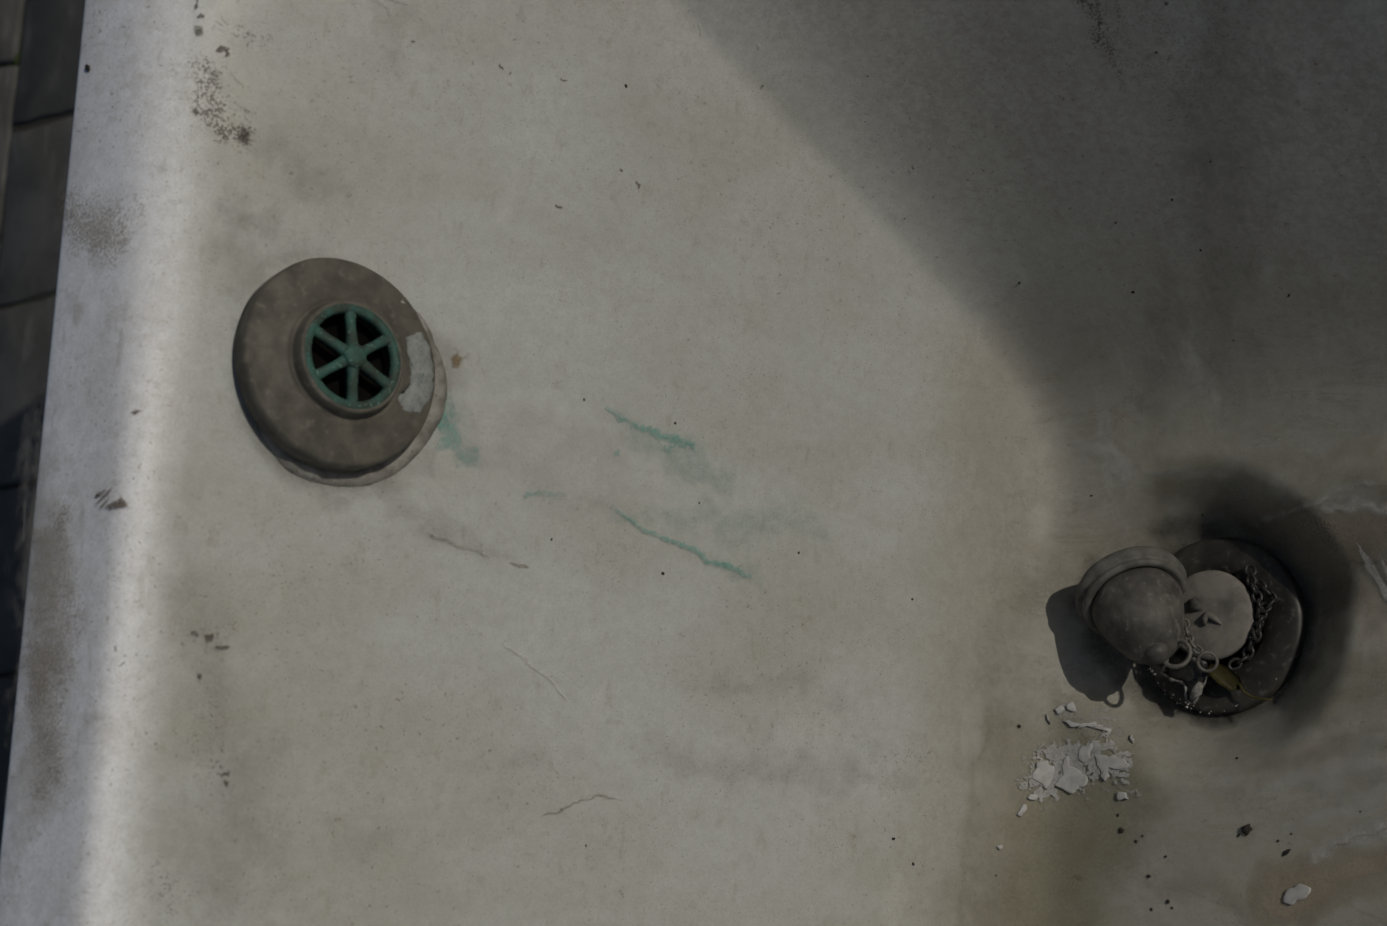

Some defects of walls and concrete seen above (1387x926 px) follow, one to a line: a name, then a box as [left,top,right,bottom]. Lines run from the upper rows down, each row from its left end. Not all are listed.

peeling [1016,701,1139,816]
water stain [1256,851,1387,919]